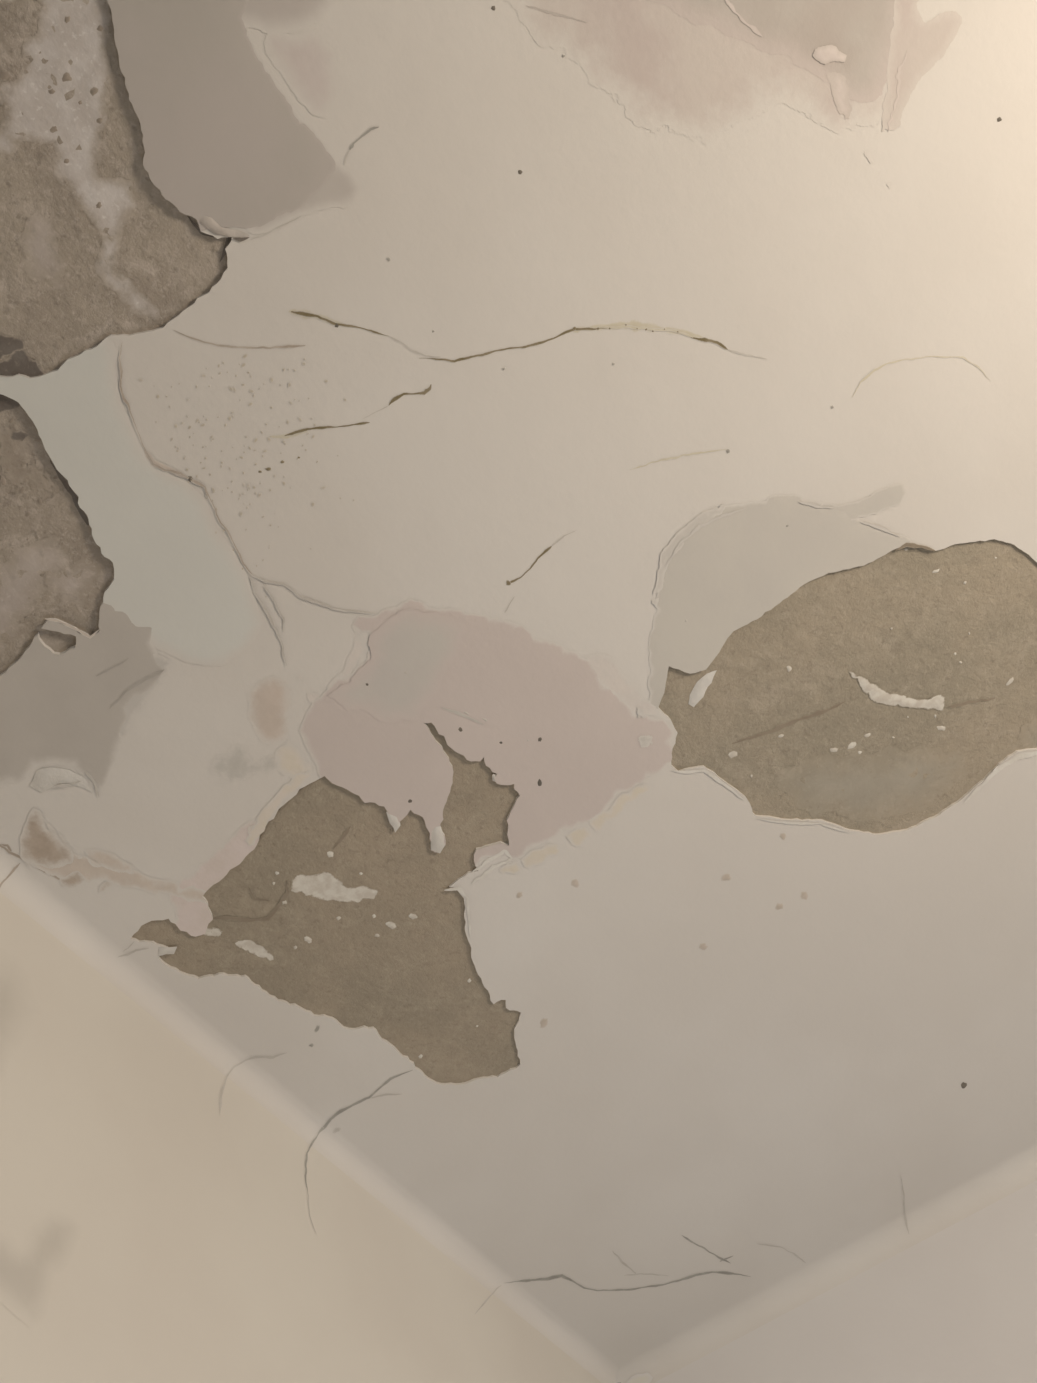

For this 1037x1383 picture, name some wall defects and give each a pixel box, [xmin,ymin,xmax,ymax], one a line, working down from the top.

spalling [0,0,249,377]
spalling [0,394,114,674]
crack [119,344,376,666]
crack [174,308,766,473]
spalling [659,539,1037,834]
spalling [132,723,520,1083]
crack [304,1070,412,1235]
crack [475,1235,806,1314]